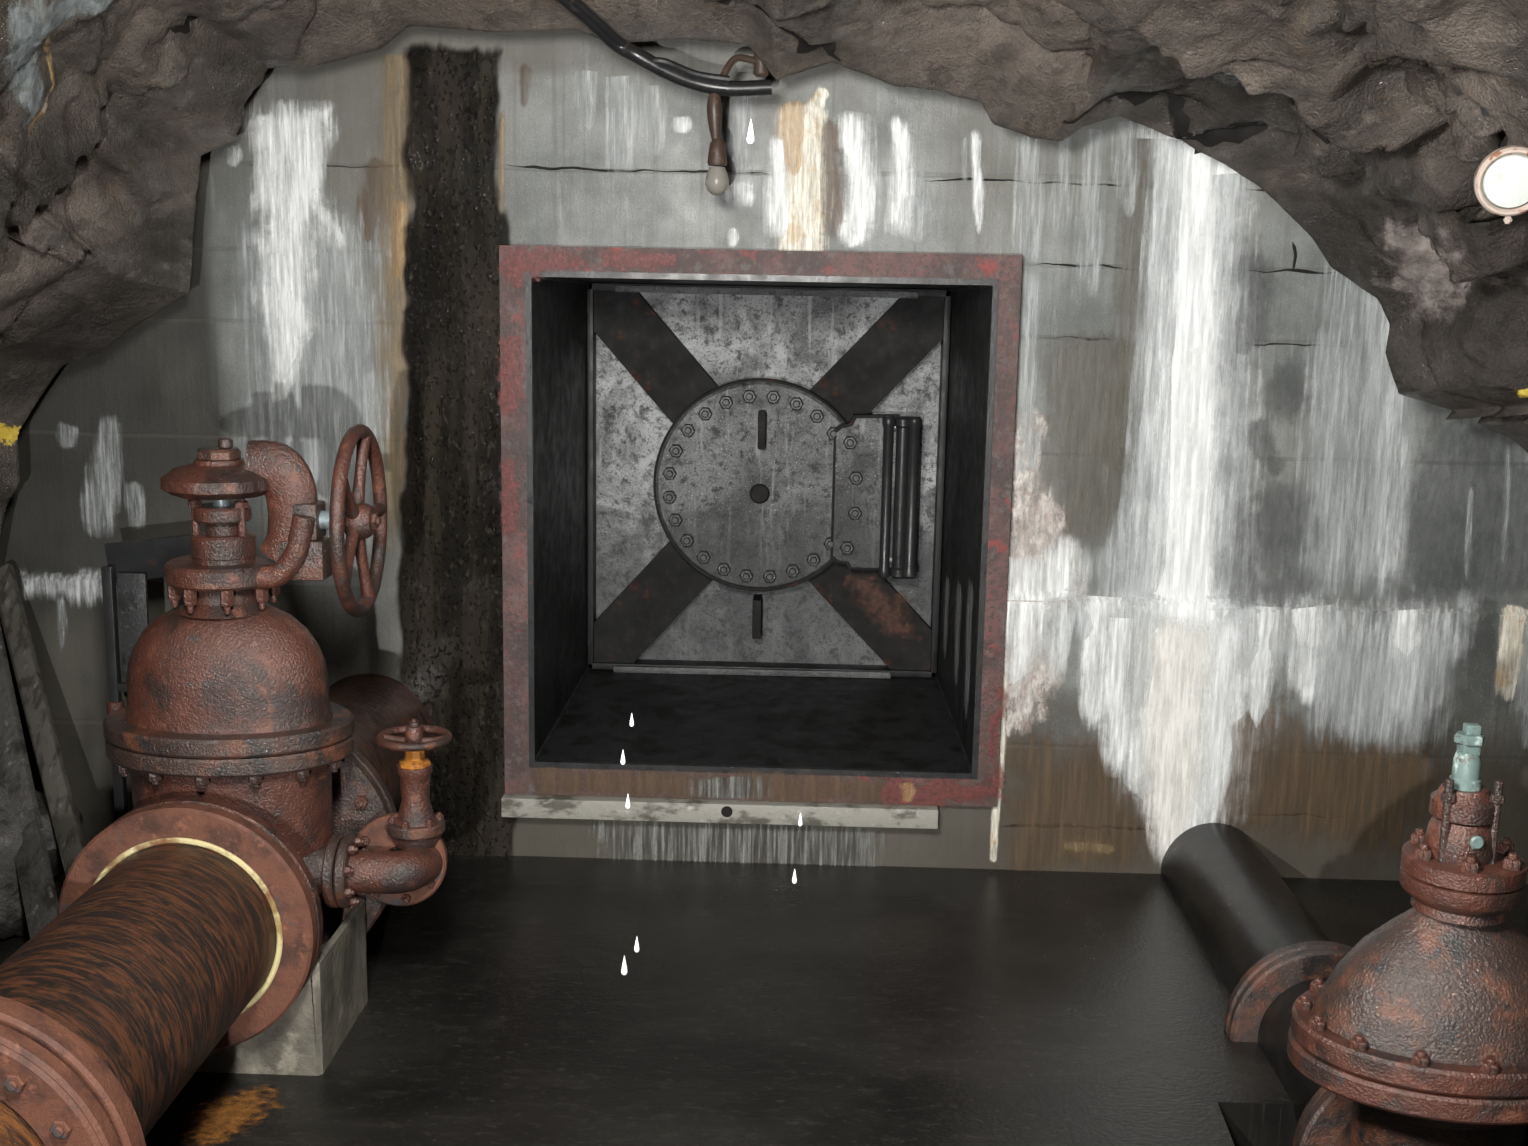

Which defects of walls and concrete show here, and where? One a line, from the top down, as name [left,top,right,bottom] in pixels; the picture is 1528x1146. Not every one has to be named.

damp [606,76,690,163]
damp [728,88,922,251]
corrosion [823,121,843,231]
damp [966,133,984,231]
damp [244,104,380,503]
damp [86,422,114,527]
damp [398,45,517,857]
damp [990,121,1470,862]
damp [24,573,103,635]